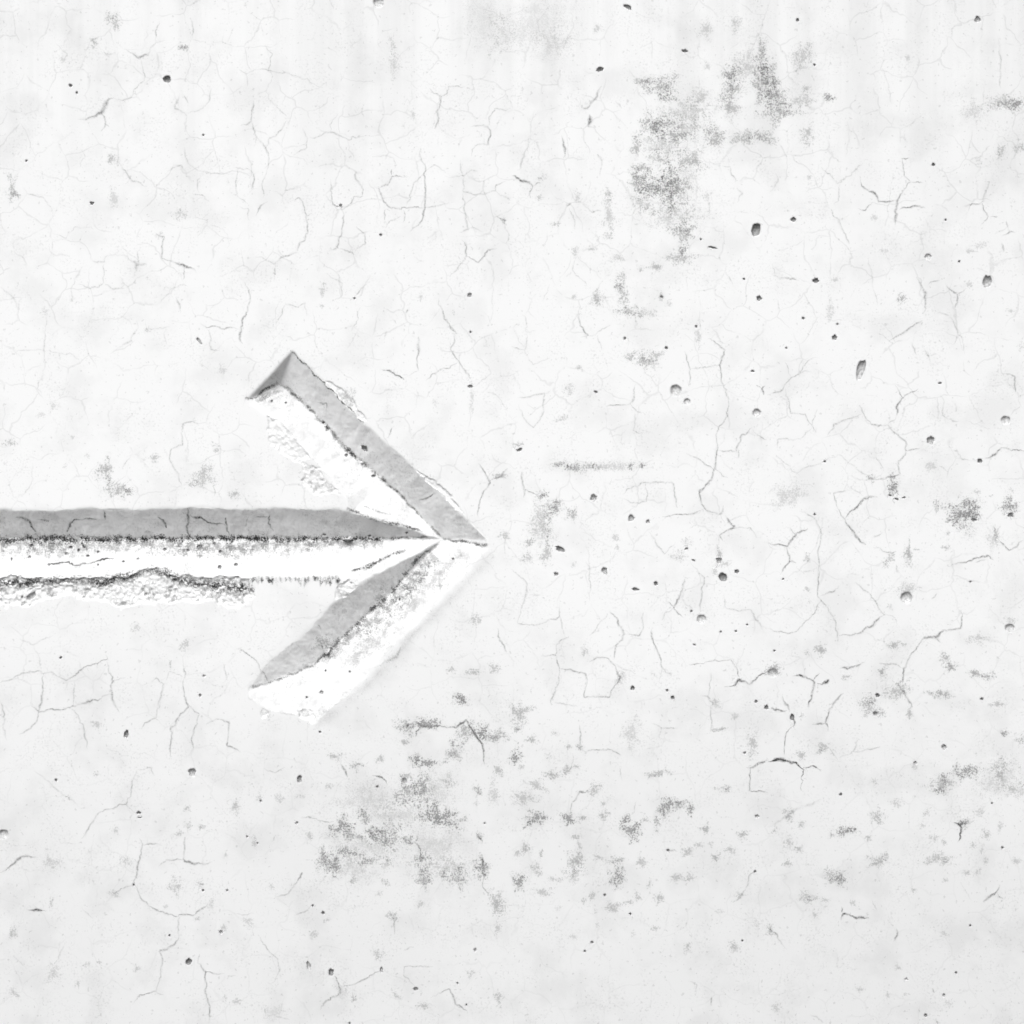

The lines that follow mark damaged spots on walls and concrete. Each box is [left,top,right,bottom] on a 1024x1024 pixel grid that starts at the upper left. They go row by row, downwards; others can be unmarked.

crack [23,512,109,566]
crack [749,709,817,792]
leakage [419,806,458,828]